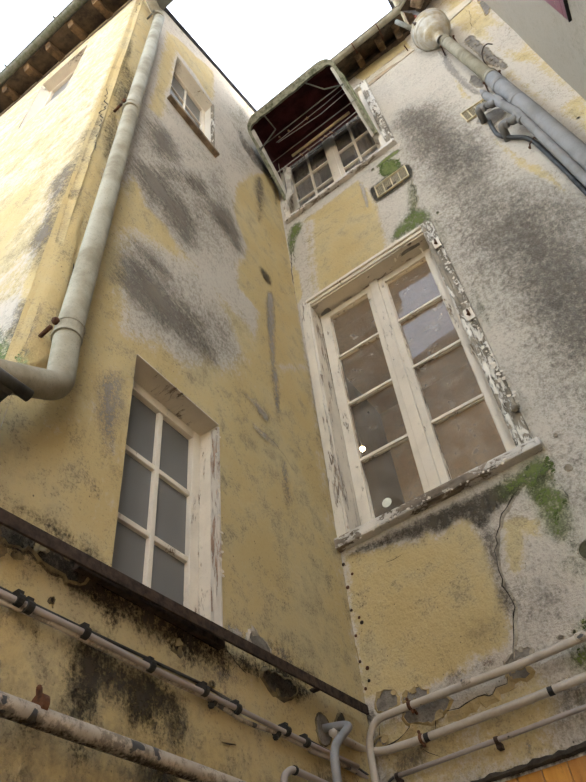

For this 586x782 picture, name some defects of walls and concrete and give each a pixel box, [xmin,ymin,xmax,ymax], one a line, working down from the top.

spalling [464,35,508,70]
crack [88,88,108,167]
water stain [137,121,196,244]
water stain [210,203,242,251]
peeling [438,248,519,403]
spalling [0,524,90,586]
water stain [351,485,519,566]
water stain [4,535,308,701]
crack [379,481,540,757]
water stain [62,642,188,753]
spalling [374,685,454,727]
spalling [502,644,536,684]